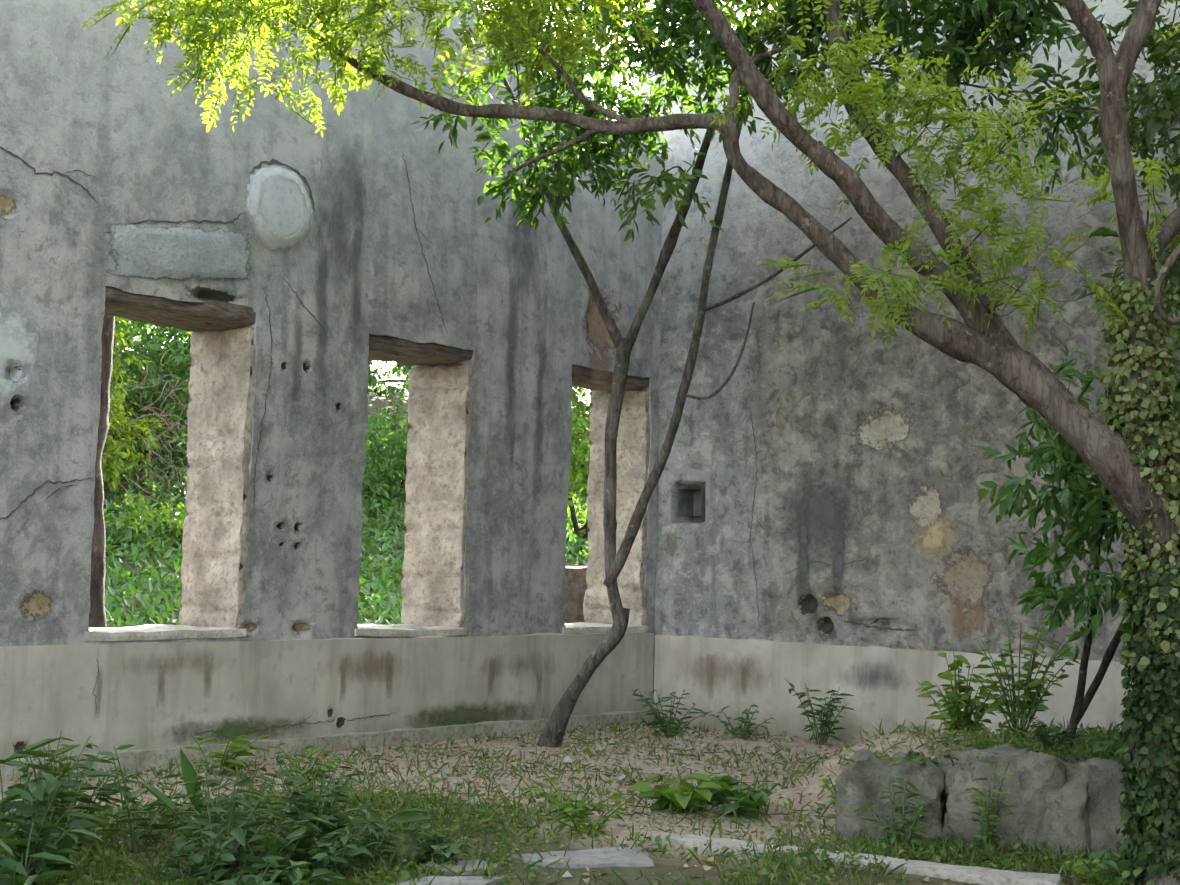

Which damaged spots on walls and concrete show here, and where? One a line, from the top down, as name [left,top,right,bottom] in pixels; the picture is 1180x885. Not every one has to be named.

crack [0,146,96,201]
crack [104,212,245,233]
crack [0,478,90,520]
spalling [904,483,949,539]
spalling [931,545,998,613]
spalling [17,589,63,622]
spalling [819,585,852,618]